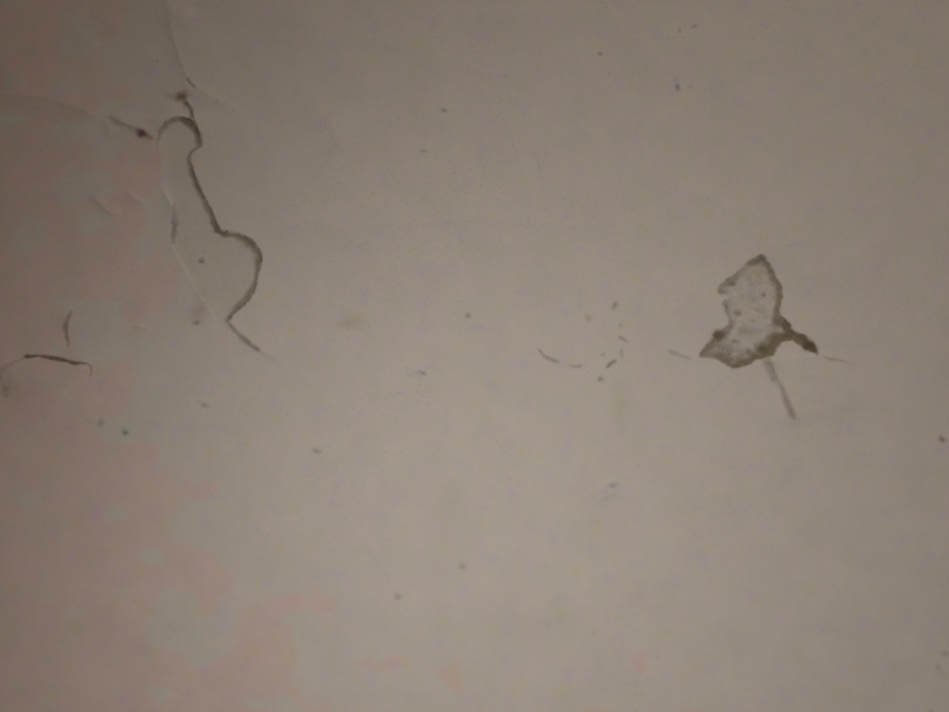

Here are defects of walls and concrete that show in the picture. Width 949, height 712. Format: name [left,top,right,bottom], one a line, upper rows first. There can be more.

peeling [104,102,270,334]
spalling [699,244,827,377]